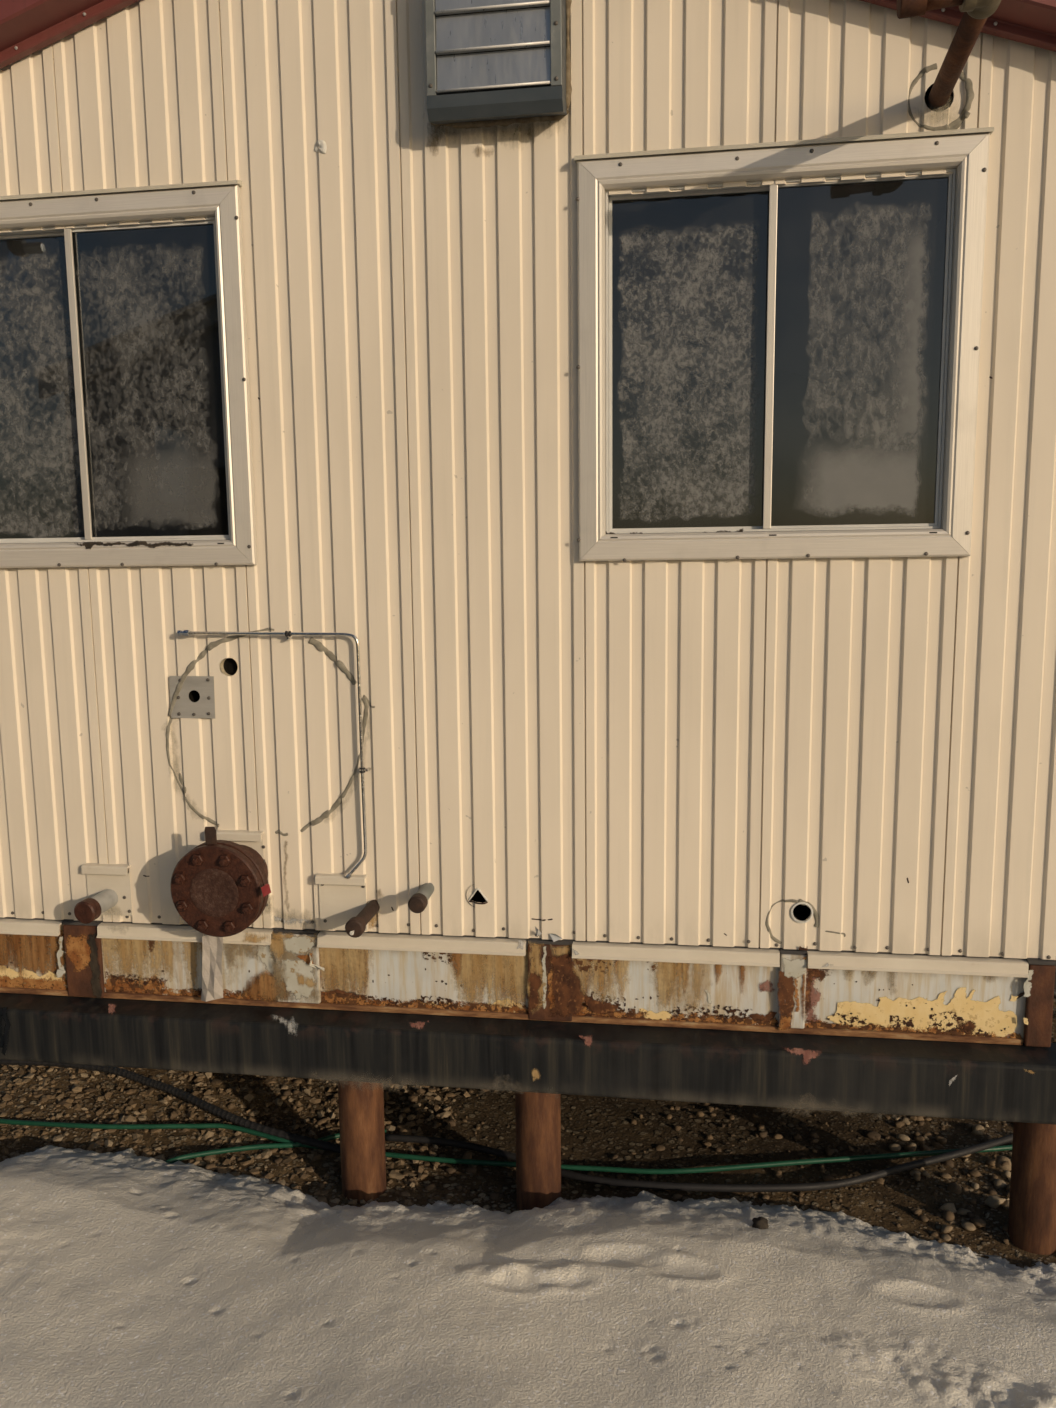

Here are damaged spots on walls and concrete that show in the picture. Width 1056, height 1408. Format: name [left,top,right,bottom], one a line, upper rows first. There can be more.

peeling [0,937,65,984]
rust [0,930,203,998]
peeling [257,936,324,999]
rust [223,933,1022,1039]
peeling [827,970,1033,1037]